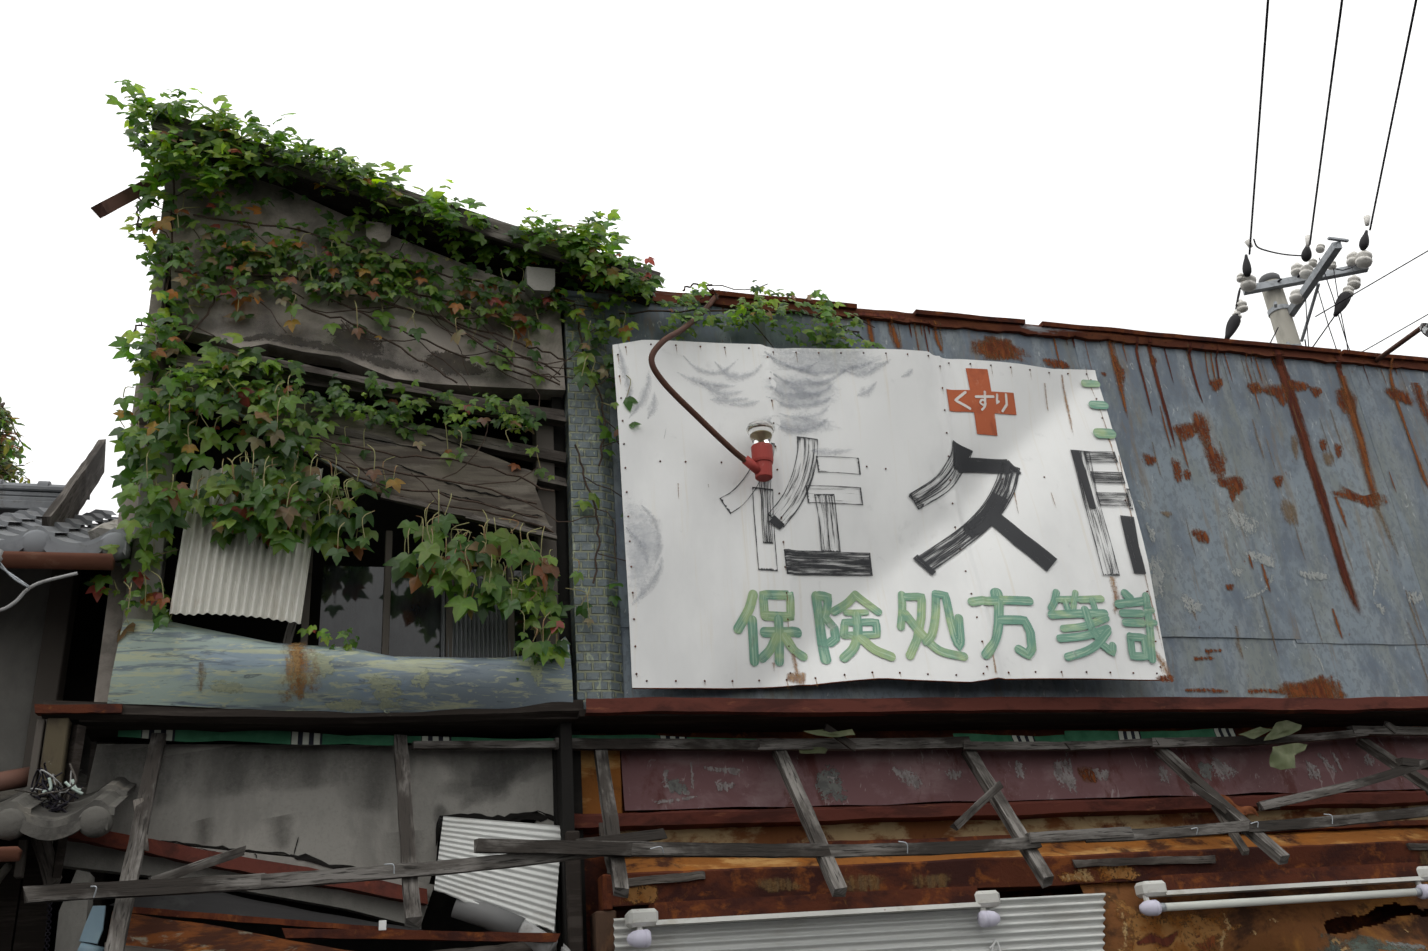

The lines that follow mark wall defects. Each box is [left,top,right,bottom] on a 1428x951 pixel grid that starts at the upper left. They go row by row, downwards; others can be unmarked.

corrosion [972,336,1025,373]
corrosion [1363,357,1428,487]
corrosion [1043,331,1398,611]
corrosion [283,642,317,702]
corrosion [1145,576,1228,693]
corrosion [1248,555,1275,646]
corrosion [1248,675,1346,698]
corrosion [625,885,657,905]